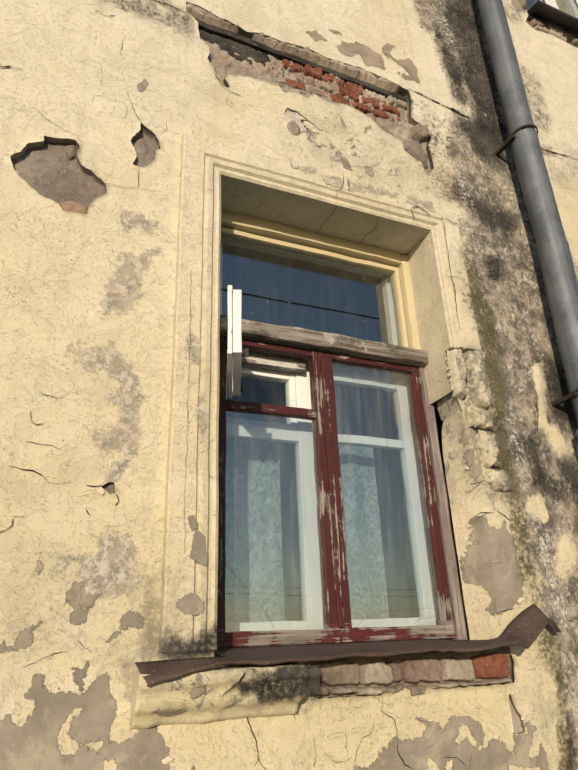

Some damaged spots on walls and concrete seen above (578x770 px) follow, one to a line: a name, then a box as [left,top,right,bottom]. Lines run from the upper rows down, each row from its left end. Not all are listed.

flaking render [186,3,447,174]
leakage [431,0,508,161]
flaking render [12,142,105,214]
leakage [455,165,520,241]
flaking render [445,349,513,492]
leakage [511,413,578,503]
leakage [543,359,577,426]
peeling [459,515,527,615]
peeling [0,661,175,770]
leakage [236,662,321,703]
peeling [354,696,549,770]
leakage [563,656,578,770]